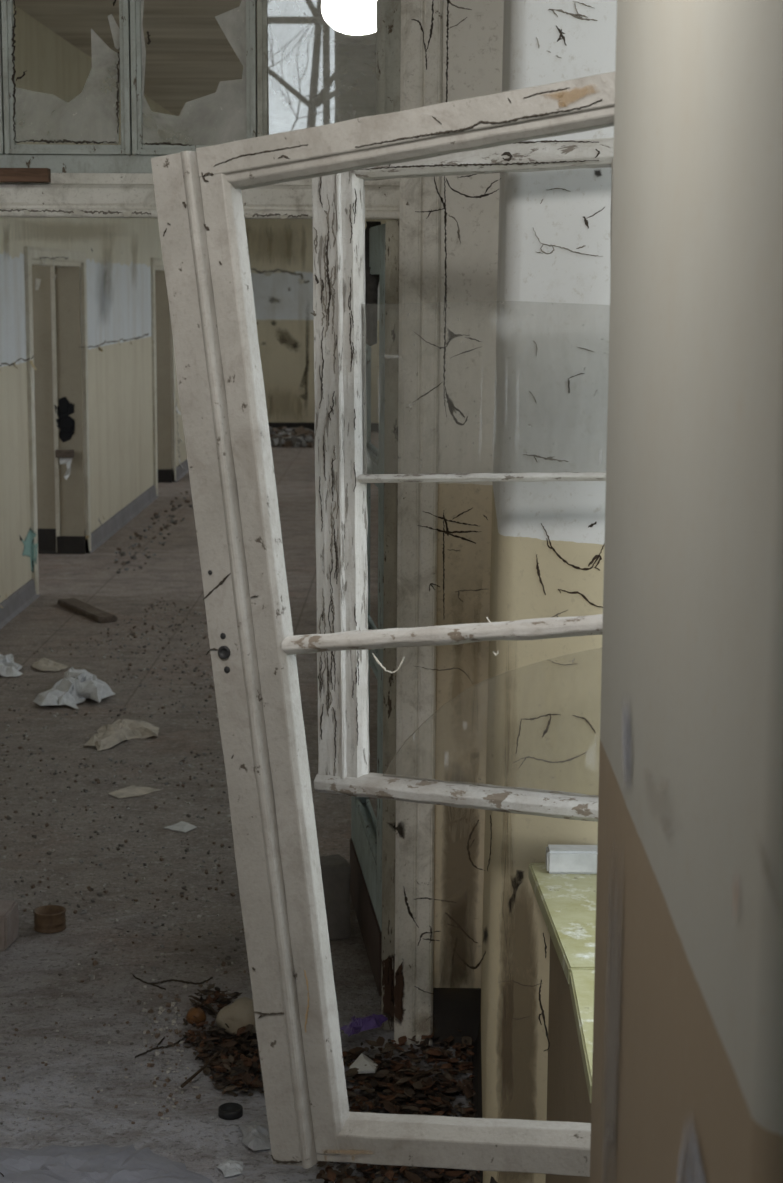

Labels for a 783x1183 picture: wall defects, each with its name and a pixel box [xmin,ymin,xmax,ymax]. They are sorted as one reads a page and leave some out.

crack [311,0,605,768]
peeling [380,955,404,1024]